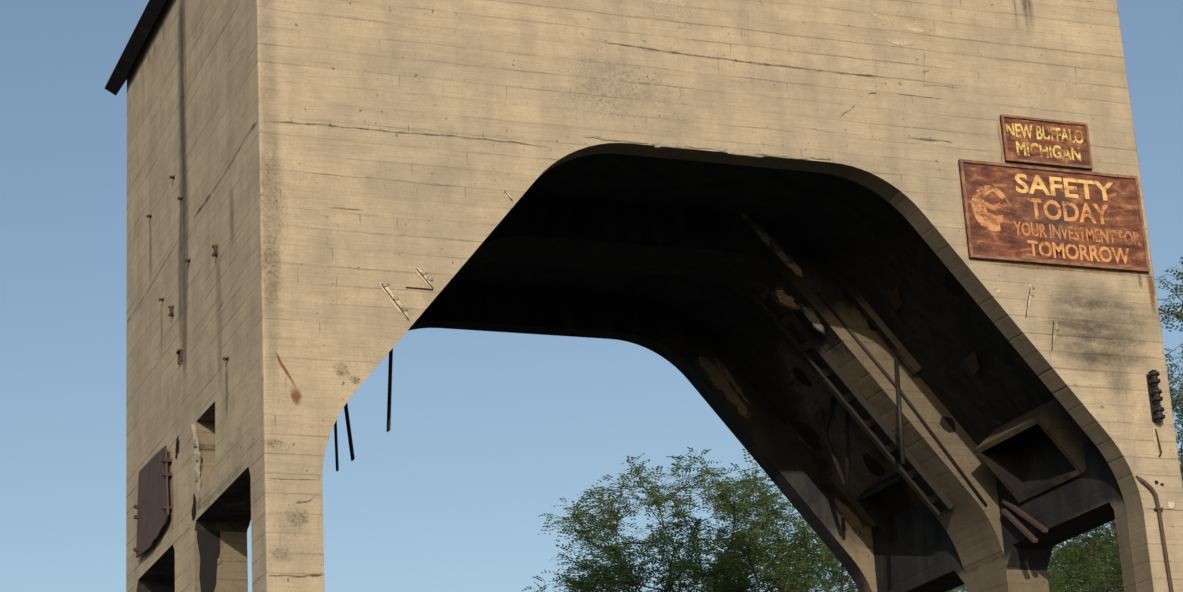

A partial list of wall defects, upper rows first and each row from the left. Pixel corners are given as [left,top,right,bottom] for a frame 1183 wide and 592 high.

spalling [740,213,805,279]
corrosion [278,356,300,401]